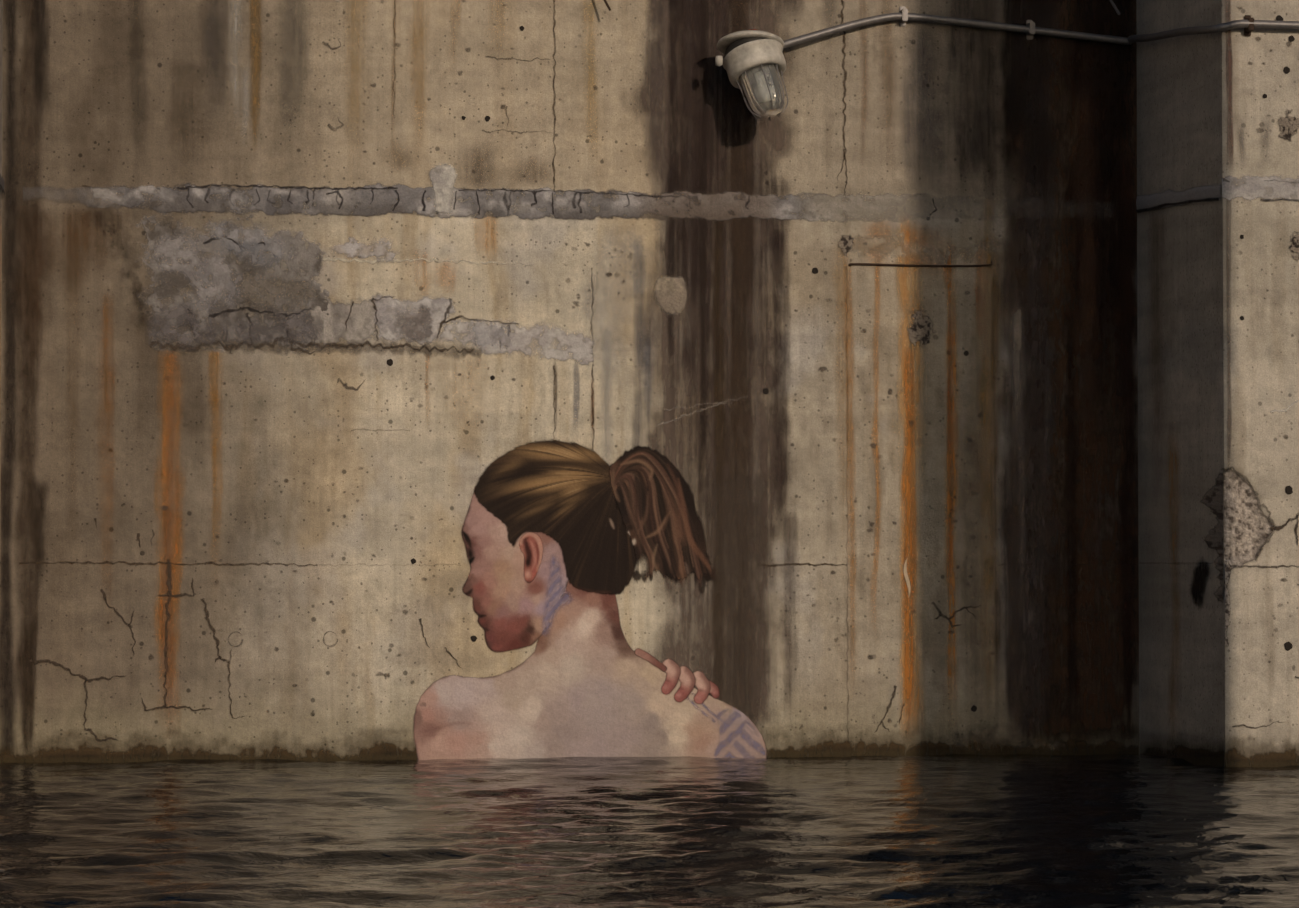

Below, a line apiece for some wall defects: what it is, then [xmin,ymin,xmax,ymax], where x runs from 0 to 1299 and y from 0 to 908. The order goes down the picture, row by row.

leakage [639,0,796,197]
crack [30,530,244,741]
leakage [634,216,793,726]
corrosion [899,229,920,713]
corrosion [946,332,956,679]
crack [932,602,981,628]
leakage [952,0,1139,741]
spalling [1191,467,1274,646]
crack [1270,513,1299,545]